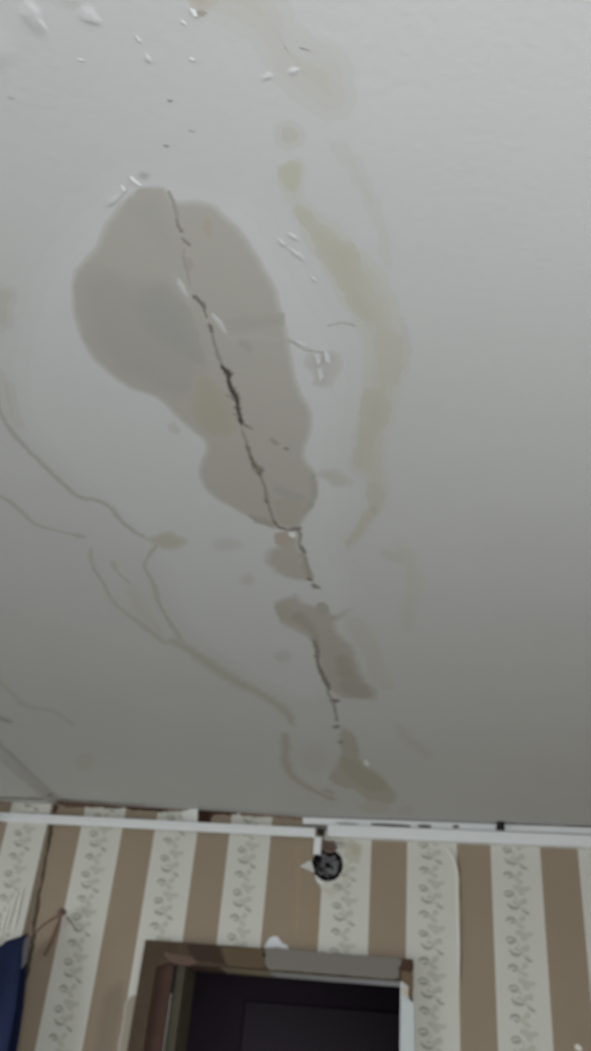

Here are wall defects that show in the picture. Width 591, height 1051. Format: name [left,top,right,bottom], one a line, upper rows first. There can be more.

water stain [0,141,416,816]
crack [167,190,321,589]
crack [312,640,344,744]